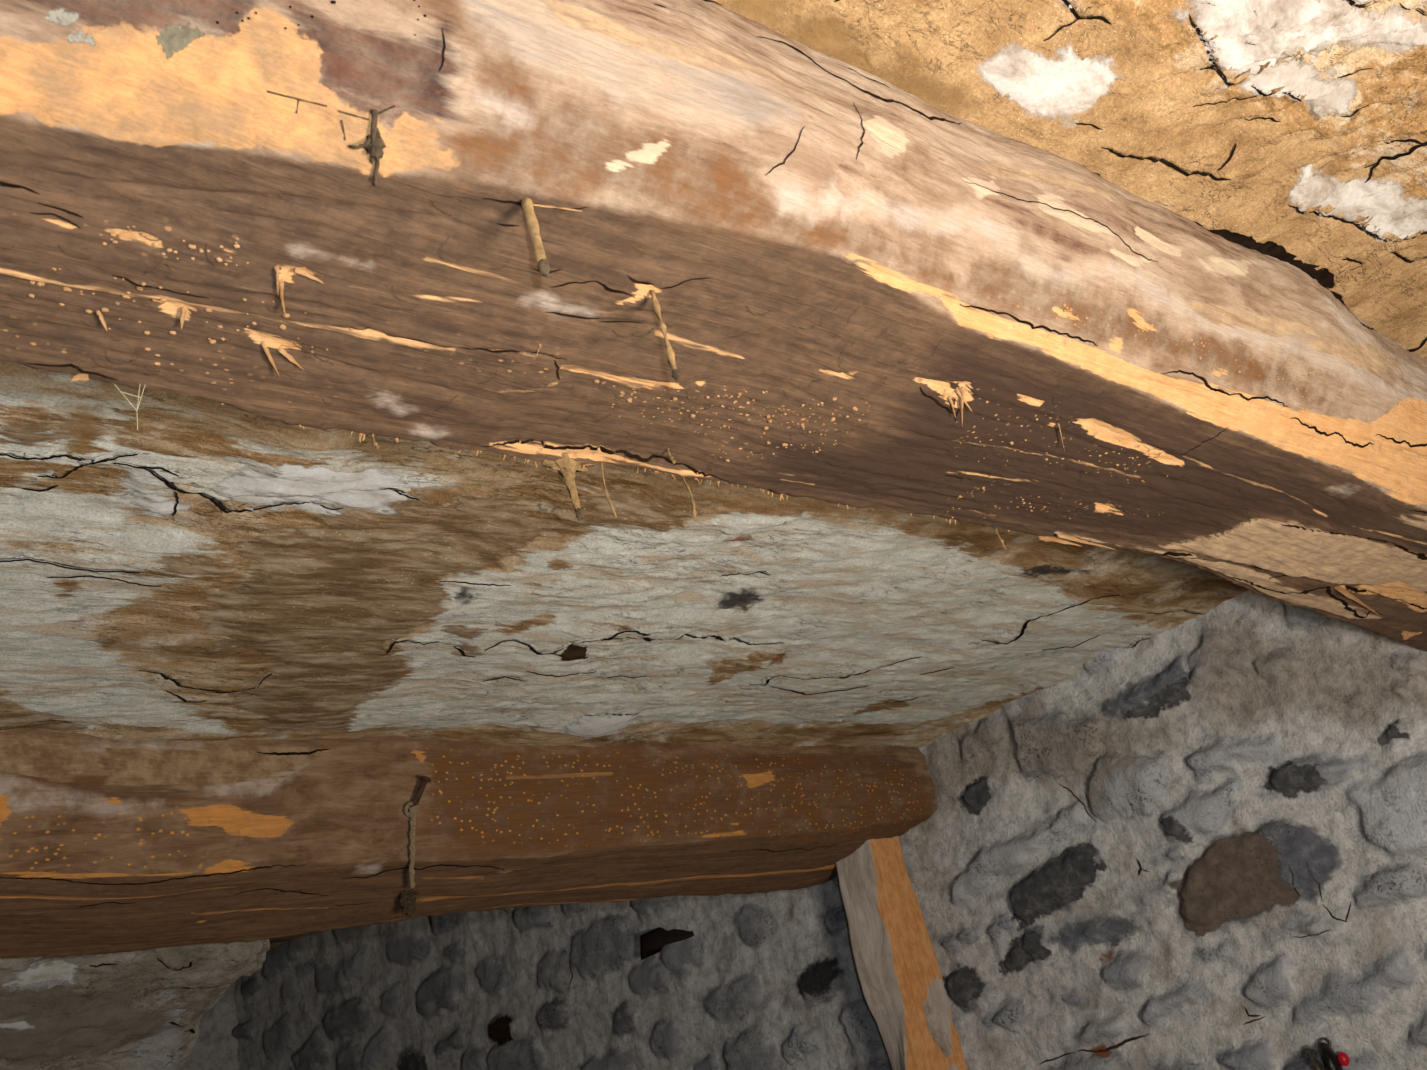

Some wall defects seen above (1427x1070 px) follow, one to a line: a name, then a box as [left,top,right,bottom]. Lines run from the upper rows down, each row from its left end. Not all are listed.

crack [1044,0,1112,41]
crack [1342,0,1427,16]
crack [1076,13,1307,181]
crack [1337,68,1373,117]
crack [967,182,1158,262]
crack [1288,139,1427,264]
crack [960,304,1098,346]
crack [0,450,344,516]
crack [384,486,420,501]